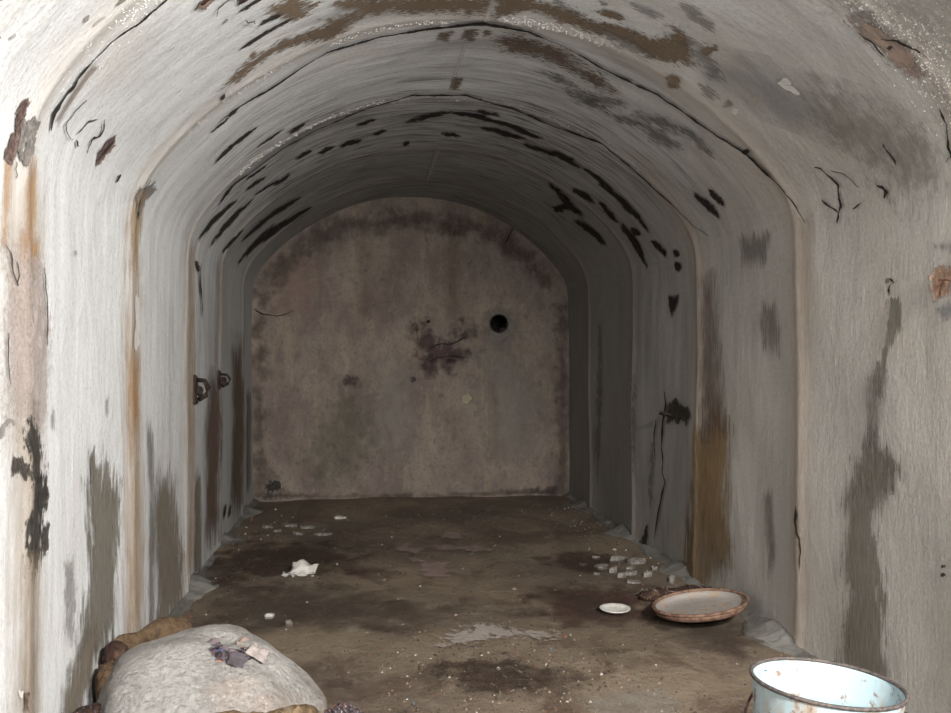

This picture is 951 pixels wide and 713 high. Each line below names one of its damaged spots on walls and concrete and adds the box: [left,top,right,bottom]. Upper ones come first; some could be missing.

spalling [4,98,41,178]
crack [51,0,167,153]
spalling [199,165,314,265]
peeling [217,0,718,100]
crack [219,22,805,236]
spalling [406,110,682,274]
crack [814,167,888,223]
leakage [12,406,55,579]
leakage [61,445,123,713]
rust [129,350,144,632]
rust [685,396,734,585]
leakage [834,278,904,677]